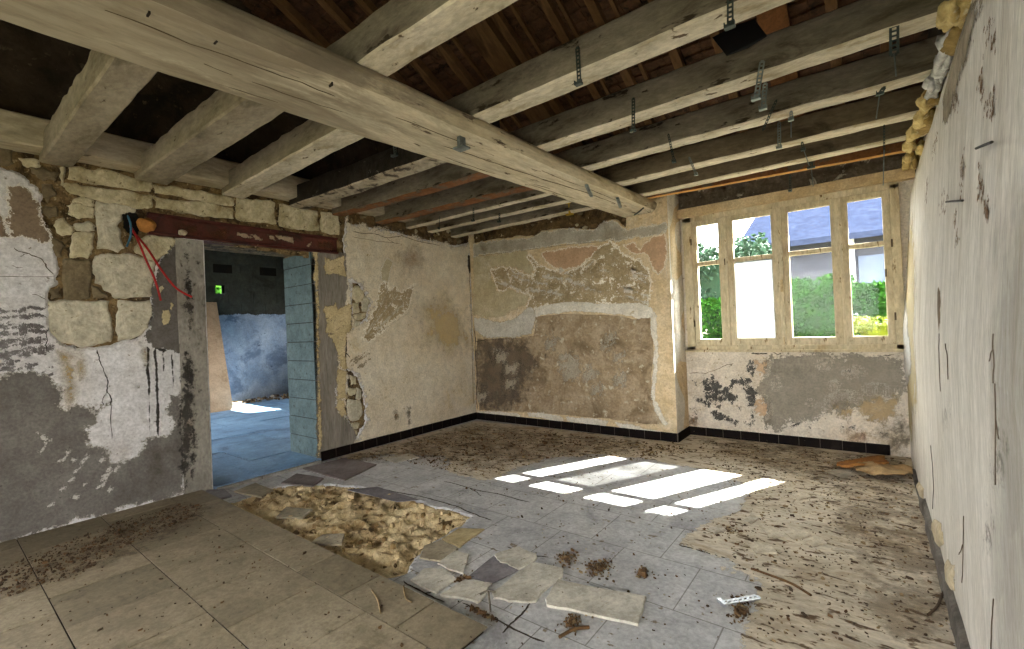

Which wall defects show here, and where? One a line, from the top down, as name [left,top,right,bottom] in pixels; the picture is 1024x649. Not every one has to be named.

peeling [0,182,53,244]
spalling [122,212,139,236]
crack [96,351,112,432]
peeling [162,303,173,325]
damp [144,347,198,487]
damp [181,253,194,329]
spalling [311,252,356,459]
flaking render [345,209,669,432]
peeling [692,360,768,427]